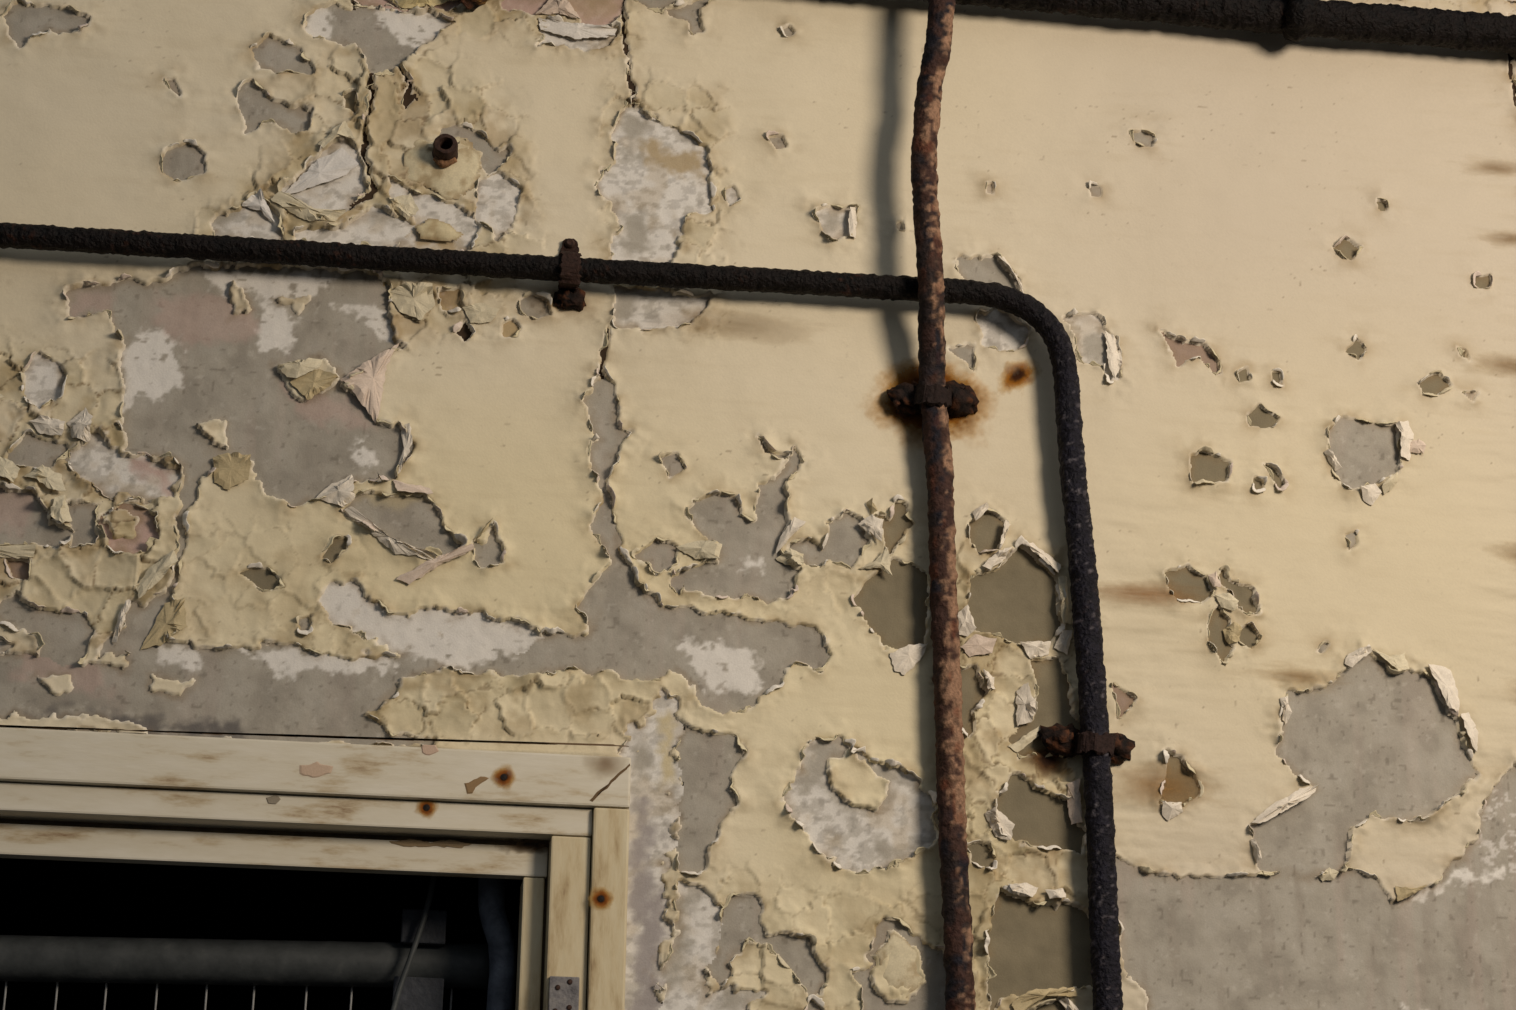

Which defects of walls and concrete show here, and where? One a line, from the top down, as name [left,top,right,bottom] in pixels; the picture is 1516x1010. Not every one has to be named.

crack [621,0,638,107]
crack [1508,53,1516,106]
rust [879,364,922,438]
rust [945,366,985,434]
rust [1004,363,1033,389]
peeling [1324,415,1426,505]
peeling [0,261,939,875]
peeling [1165,565,1263,664]
peeling [958,502,1087,870]
peeling [1116,644,1516,1010]
peeling [852,917,946,1010]
peeling [984,883,1093,1010]